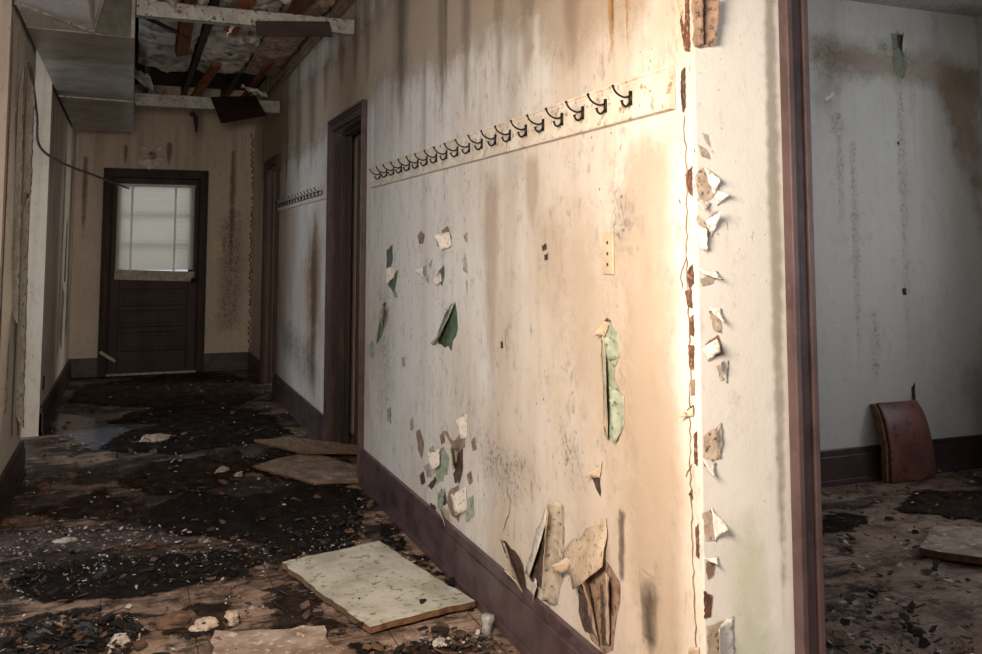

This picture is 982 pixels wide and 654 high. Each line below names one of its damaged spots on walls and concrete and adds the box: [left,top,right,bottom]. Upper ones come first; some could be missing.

peeling [677,0,720,52]
water stain [262,0,641,177]
water stain [906,59,979,159]
peeling [685,133,730,254]
water stain [284,222,317,378]
peeling [430,303,458,351]
peeling [594,318,625,444]
peeling [677,263,729,418]
peeling [410,414,477,526]
peeling [501,501,620,654]
peeling [688,591,735,654]
peeling [695,507,729,579]